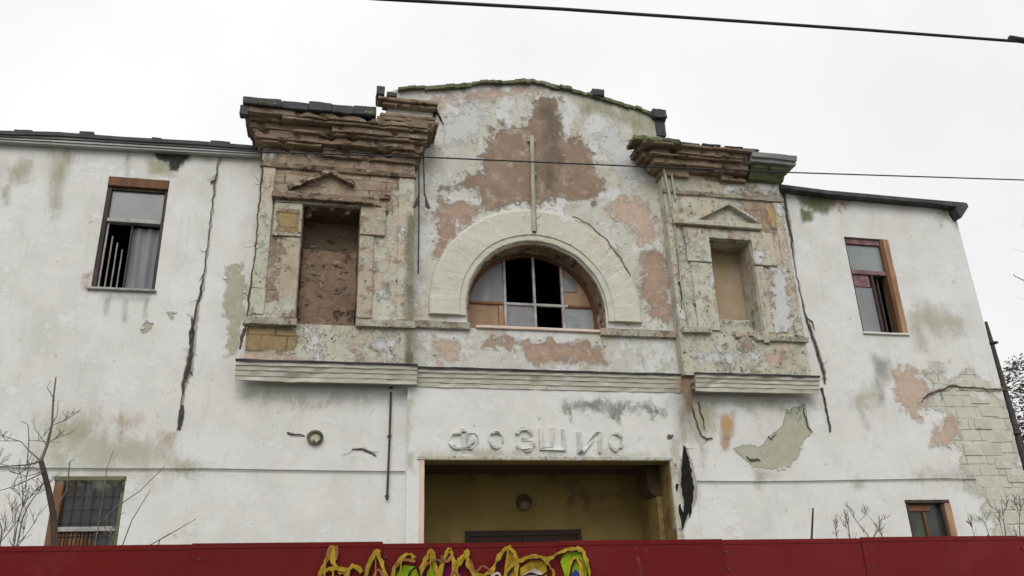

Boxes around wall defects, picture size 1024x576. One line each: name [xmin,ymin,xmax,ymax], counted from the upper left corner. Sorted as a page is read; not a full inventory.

crack [177,157,221,430]
crack [239,160,266,350]
peeling [222,263,302,360]
peeling [433,335,464,366]
peeling [481,334,608,367]
peeling [429,85,673,327]
crack [572,216,631,276]
crack [676,395,713,532]
spalling [733,405,813,470]
crack [782,193,831,432]
spalling [892,360,1024,536]
crack [917,379,1012,404]